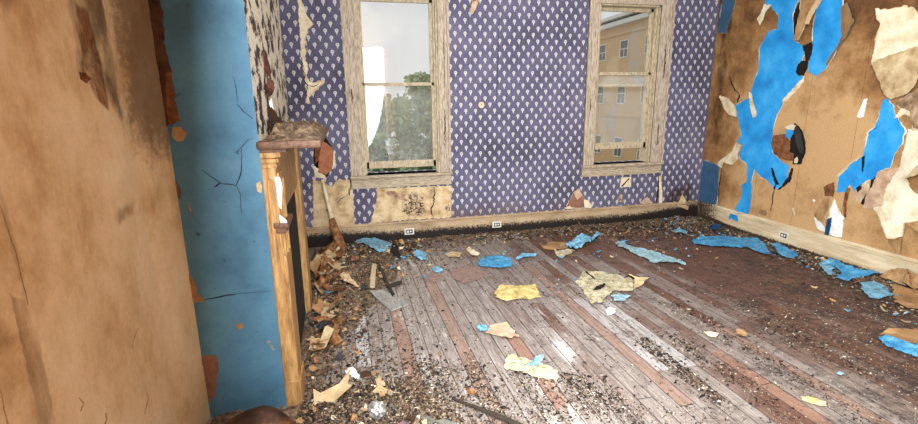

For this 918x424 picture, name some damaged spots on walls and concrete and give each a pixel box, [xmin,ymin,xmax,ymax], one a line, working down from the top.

leakage [77,0,118,108]
spalling [148,0,187,142]
crack [201,77,253,213]
peeling [262,51,275,108]
peeling [729,0,854,222]
peeling [837,98,907,192]
crack [204,291,267,300]